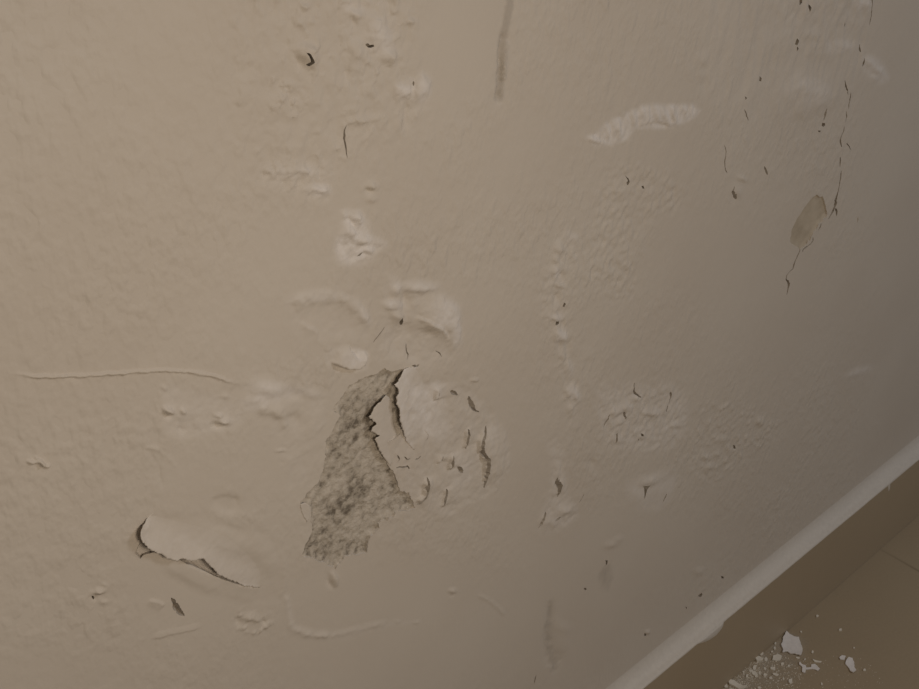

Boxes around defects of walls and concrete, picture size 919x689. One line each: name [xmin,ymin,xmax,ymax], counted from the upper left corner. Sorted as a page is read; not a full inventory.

peeling [790,195,827,252]
peeling [300,273,469,569]
peeling [140,513,261,588]